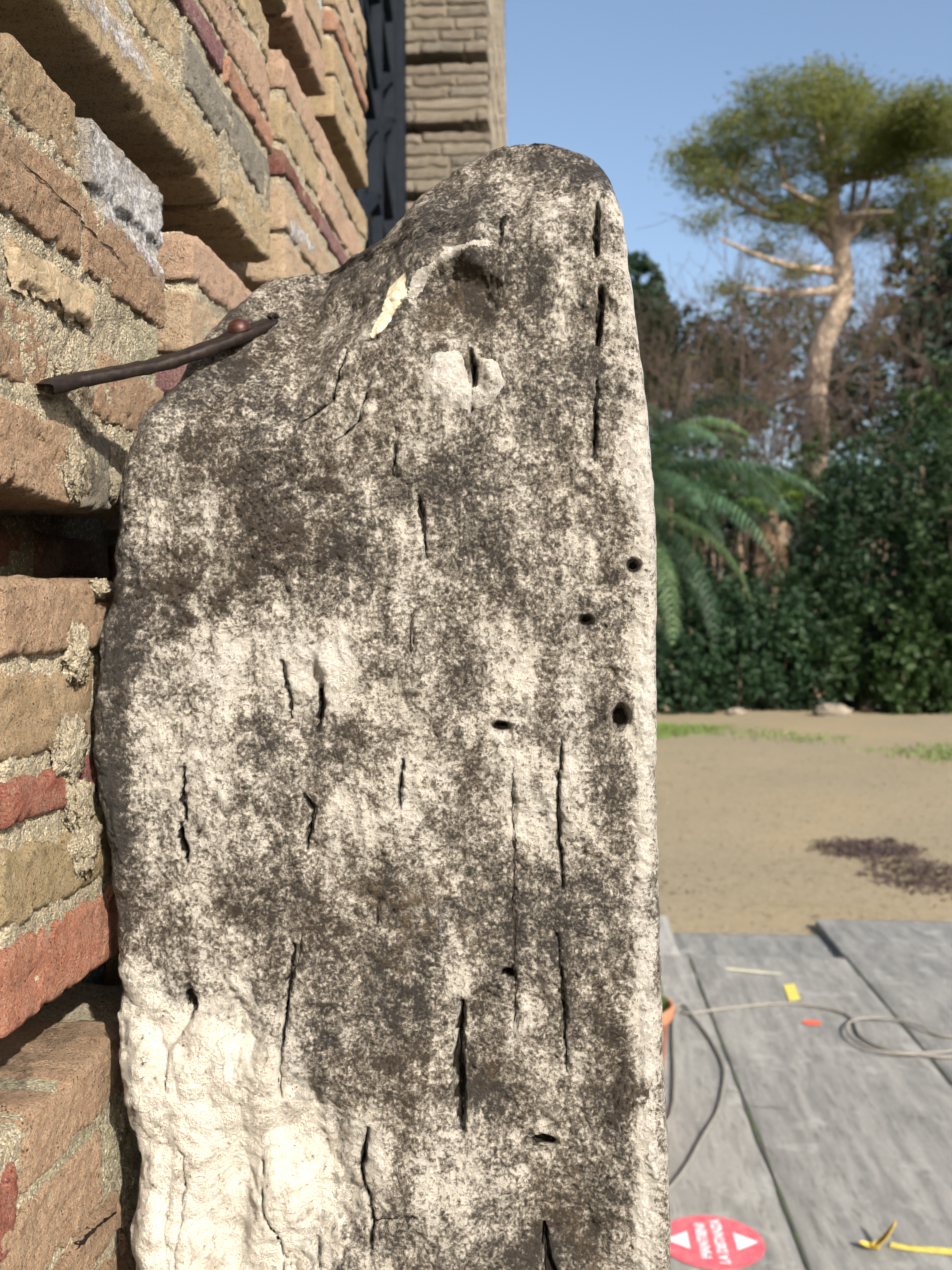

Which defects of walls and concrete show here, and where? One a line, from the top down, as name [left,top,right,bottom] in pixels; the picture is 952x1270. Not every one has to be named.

peeling [370,273,408,338]
crack [596,294,604,344]
crack [592,384,600,457]
crack [454,1000,465,1121]
crack [543,1220,555,1270]